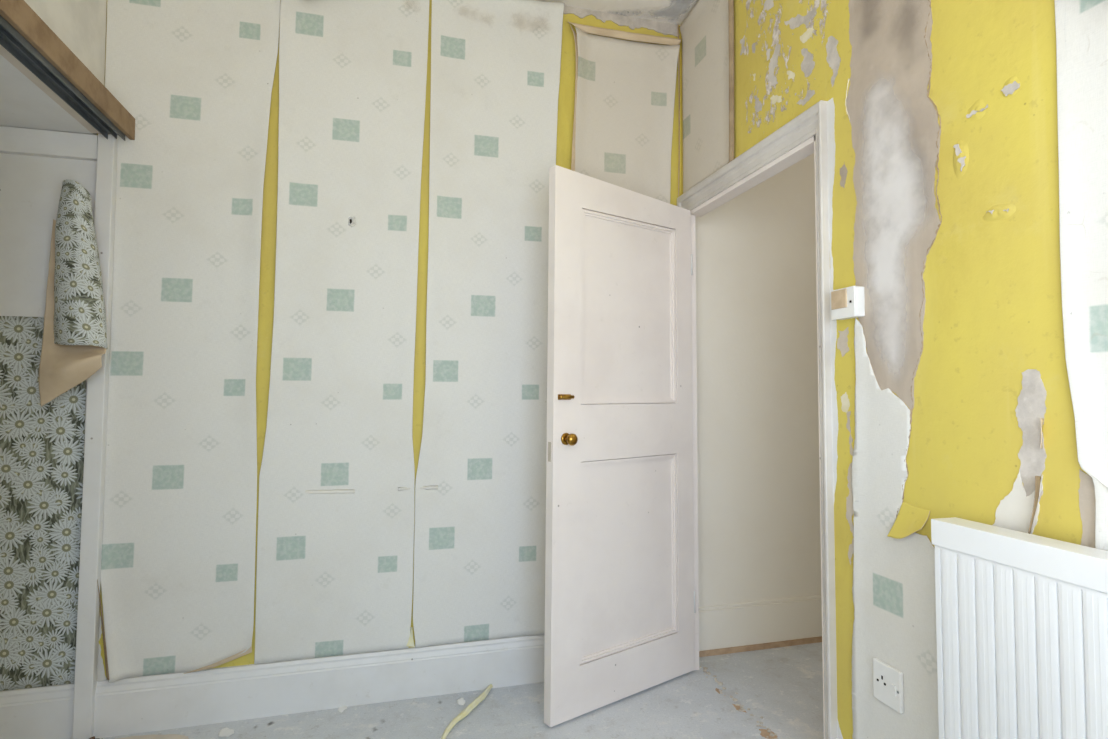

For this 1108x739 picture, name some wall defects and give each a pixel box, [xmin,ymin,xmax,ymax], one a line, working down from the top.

peeling [740,0,942,539]
peeling [1015,369,1047,502]